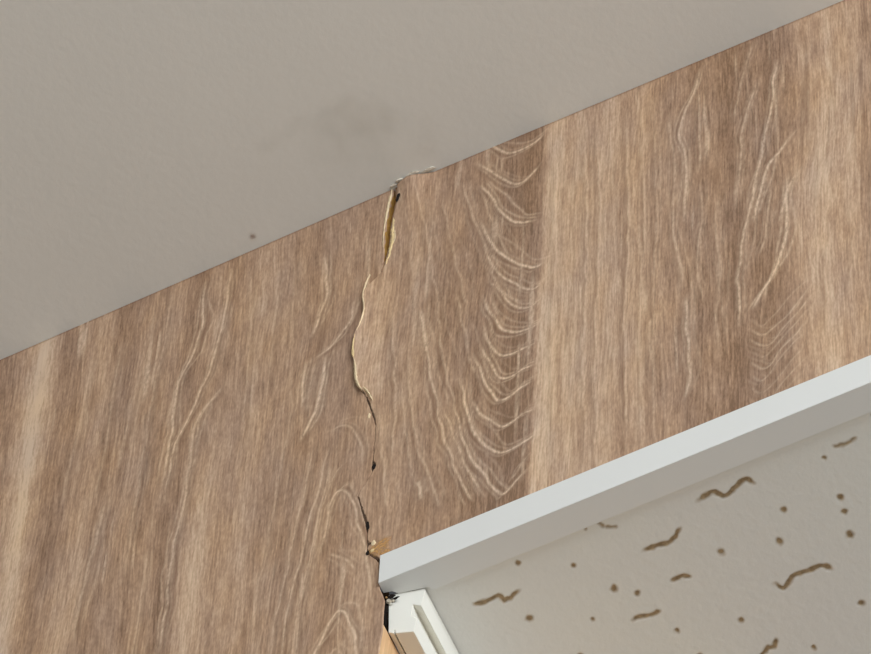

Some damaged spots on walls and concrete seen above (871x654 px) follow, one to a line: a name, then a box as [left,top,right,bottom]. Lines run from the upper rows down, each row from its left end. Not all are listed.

crack [382,189,400,269]
crack [360,503,379,560]